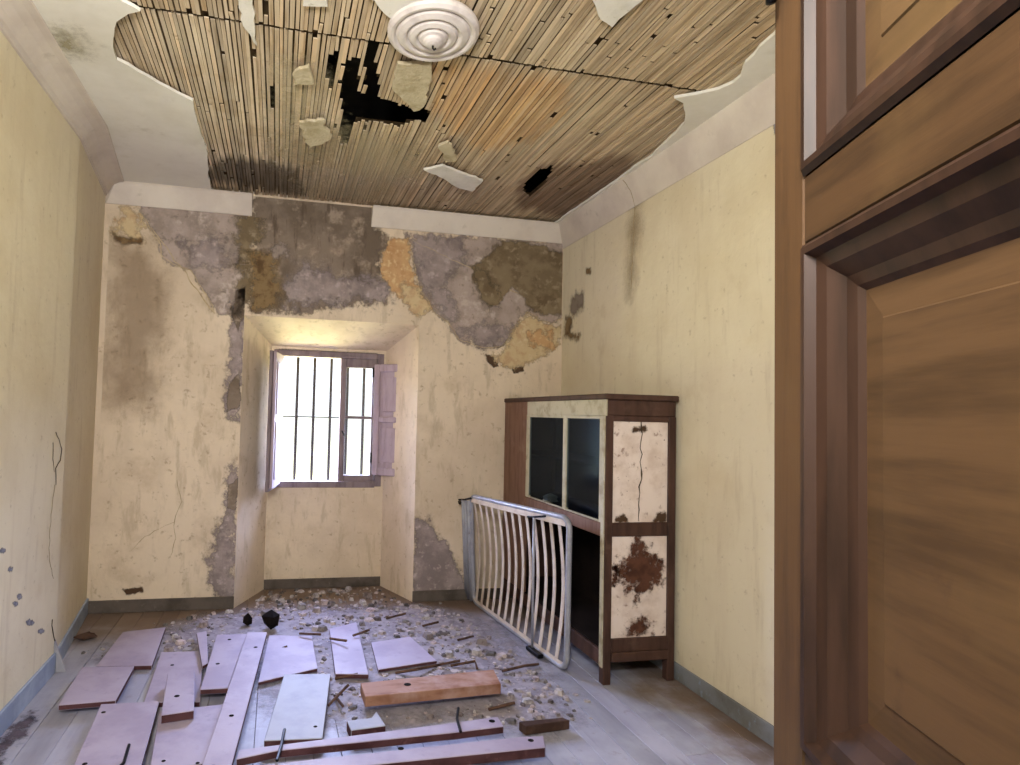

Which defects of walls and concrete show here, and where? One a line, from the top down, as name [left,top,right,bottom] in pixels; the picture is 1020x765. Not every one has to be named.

spalling [113,0,775,222]
peeling [109,206,247,422]
peeling [380,233,563,369]